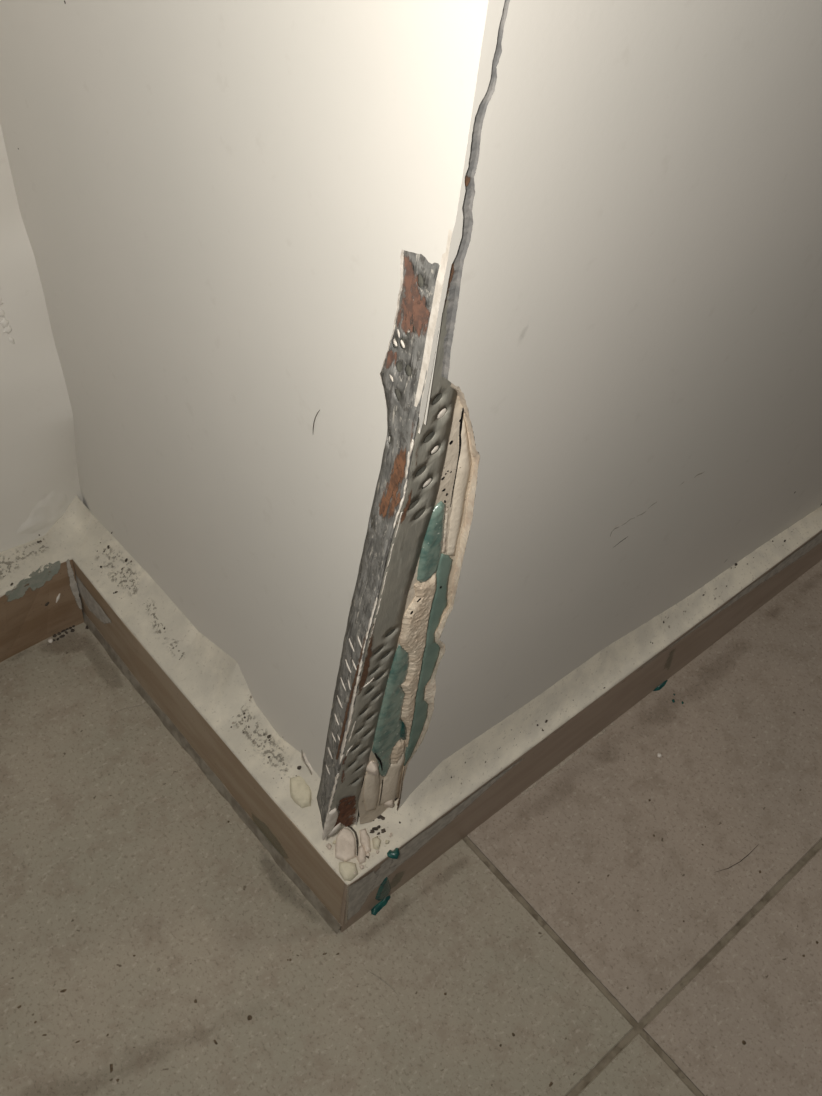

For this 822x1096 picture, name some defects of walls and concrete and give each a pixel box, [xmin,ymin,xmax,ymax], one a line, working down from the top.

crack [442,0,510,380]
rust [386,350,397,369]
rust [397,256,430,336]
rust [379,424,417,524]
rust [336,624,374,783]
peeling [322,439,415,841]
spalling [358,383,480,824]
rust [334,796,357,827]